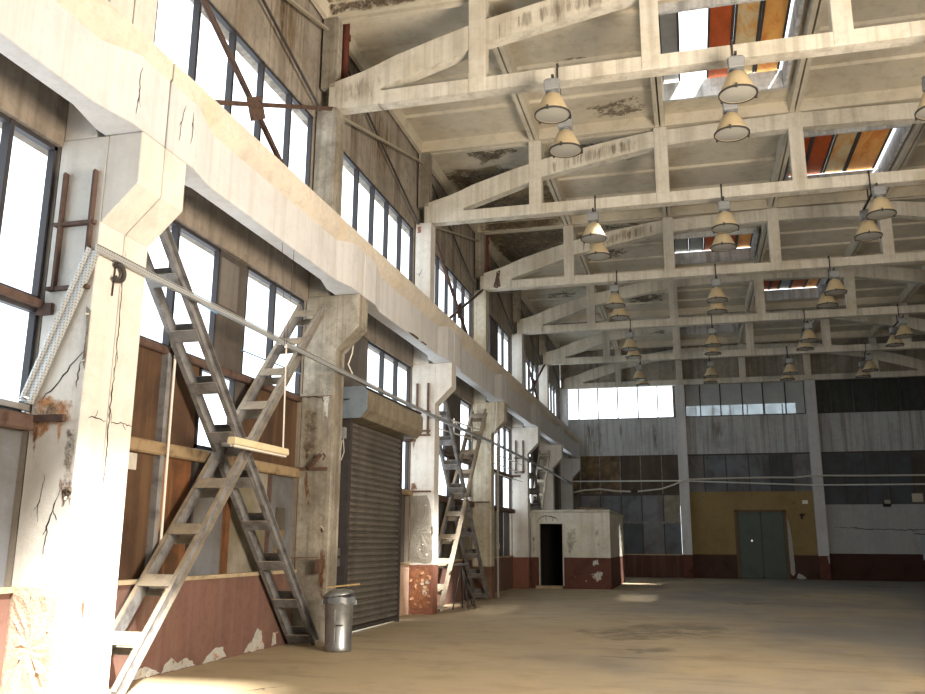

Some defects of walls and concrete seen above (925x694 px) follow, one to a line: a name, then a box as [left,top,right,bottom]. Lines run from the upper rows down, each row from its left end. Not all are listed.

mould [329,0,415,15]
damp [588,97,643,117]
damp [446,148,517,192]
damp [474,187,529,209]
damp [543,181,555,203]
crack [89,292,130,526]
corrosion [33,396,68,449]
crack [837,527,925,535]
flaking render [409,495,434,611]
peeling [244,628,278,653]
peeling [132,647,226,681]